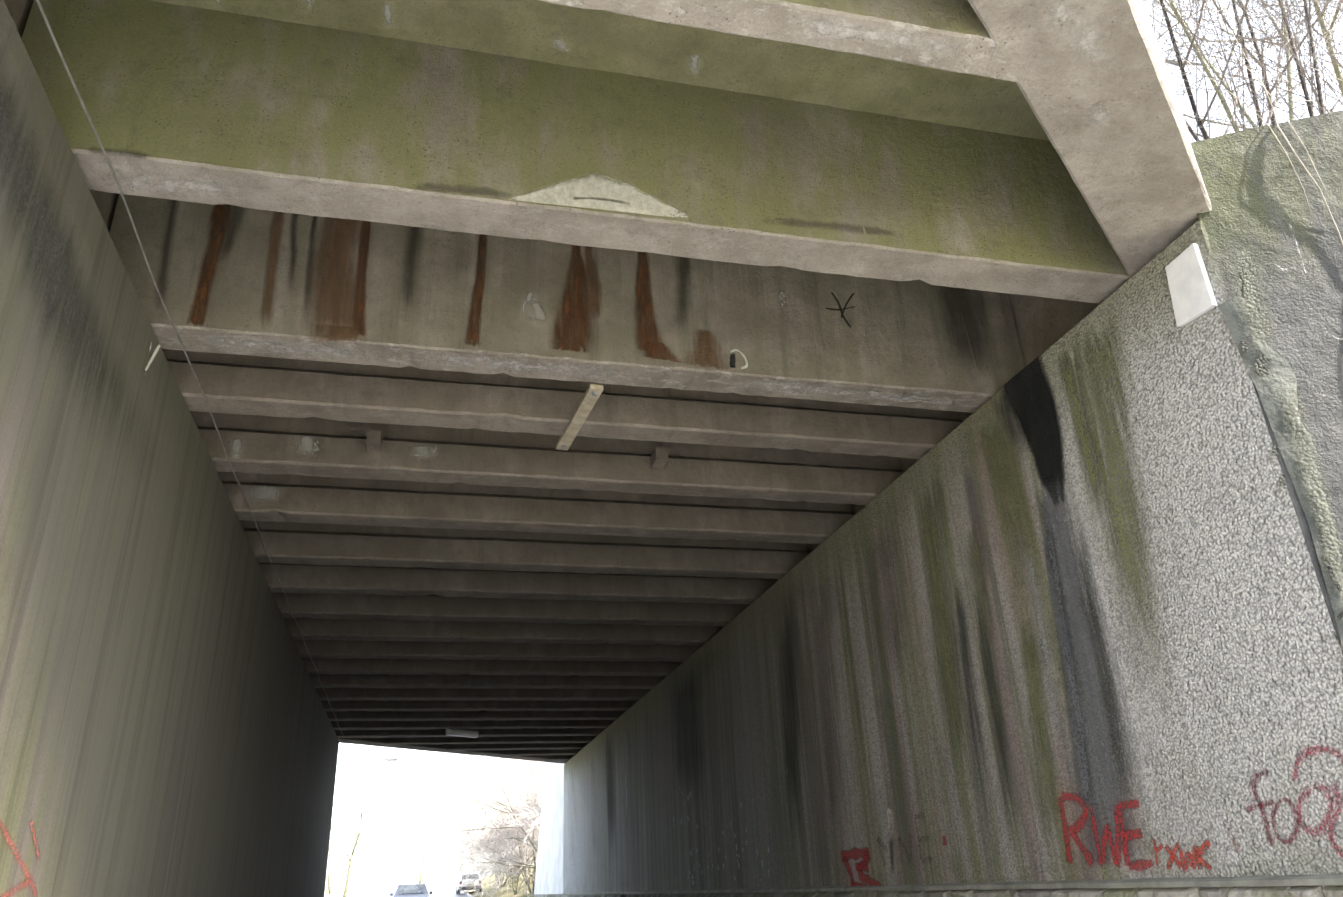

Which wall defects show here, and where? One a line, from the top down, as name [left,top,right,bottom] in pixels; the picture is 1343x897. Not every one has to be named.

rust [188,204,242,325]
rust [262,211,283,319]
rust [307,216,371,341]
rust [466,234,487,346]
rust [553,245,601,352]
rust [636,251,723,369]
damp [999,356,1133,864]